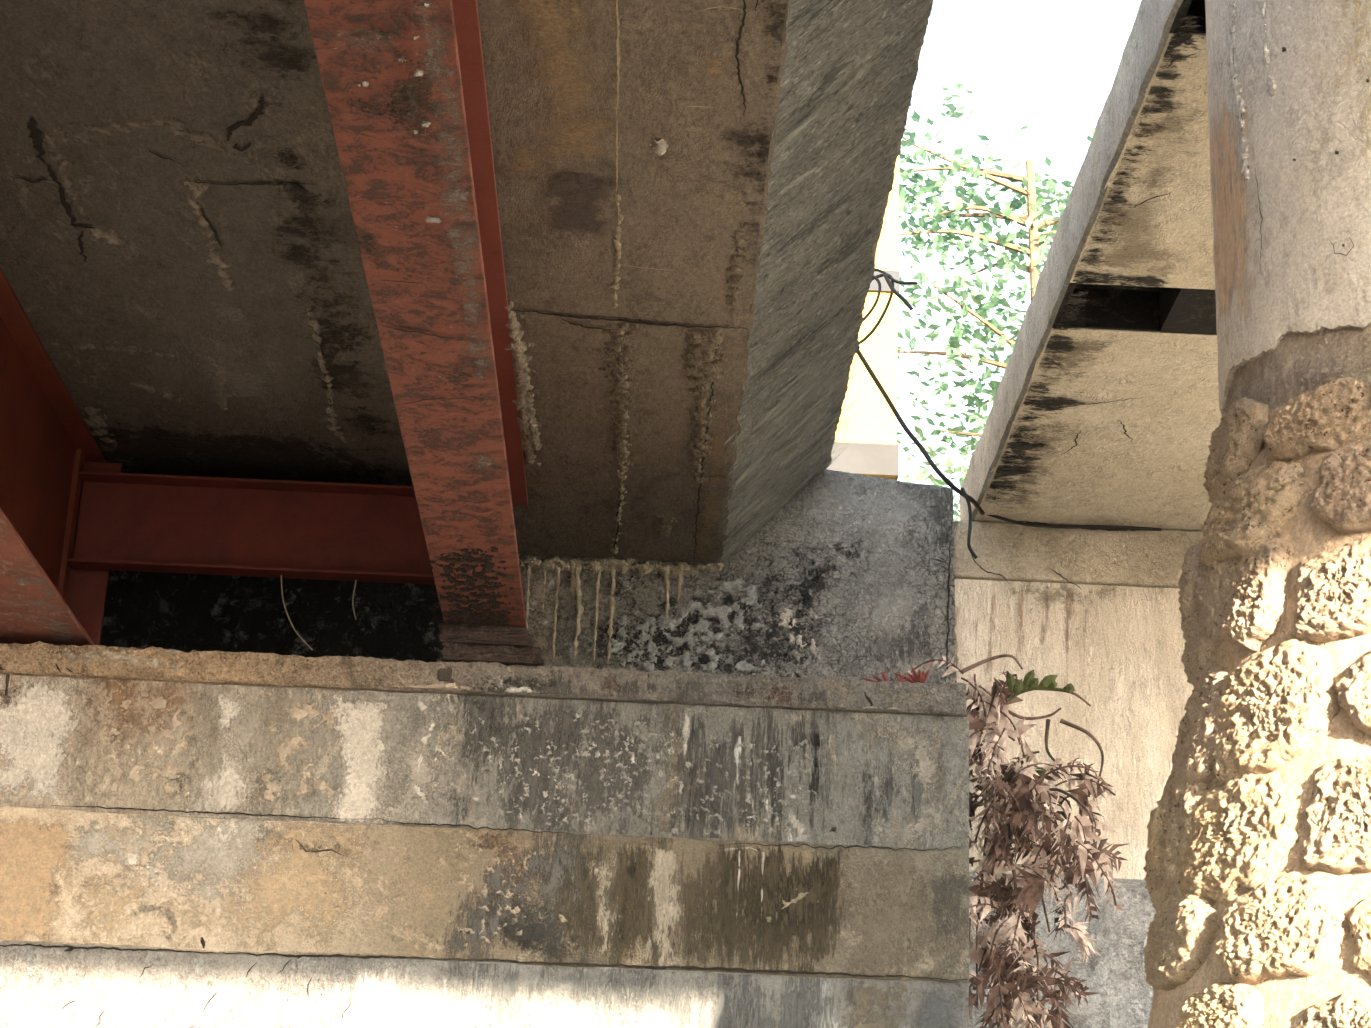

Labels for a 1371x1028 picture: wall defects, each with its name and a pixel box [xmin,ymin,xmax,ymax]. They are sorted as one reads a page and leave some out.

crack [10,118,126,262]
crack [149,97,307,248]
leakage [515,0,614,234]
crack [510,0,786,332]
leakage [766,51,868,162]
leakage [985,5,1204,502]
corrosion [428,547,516,627]
leakage [78,294,968,1028]
peeling [589,562,829,677]
leakage [0,820,72,941]